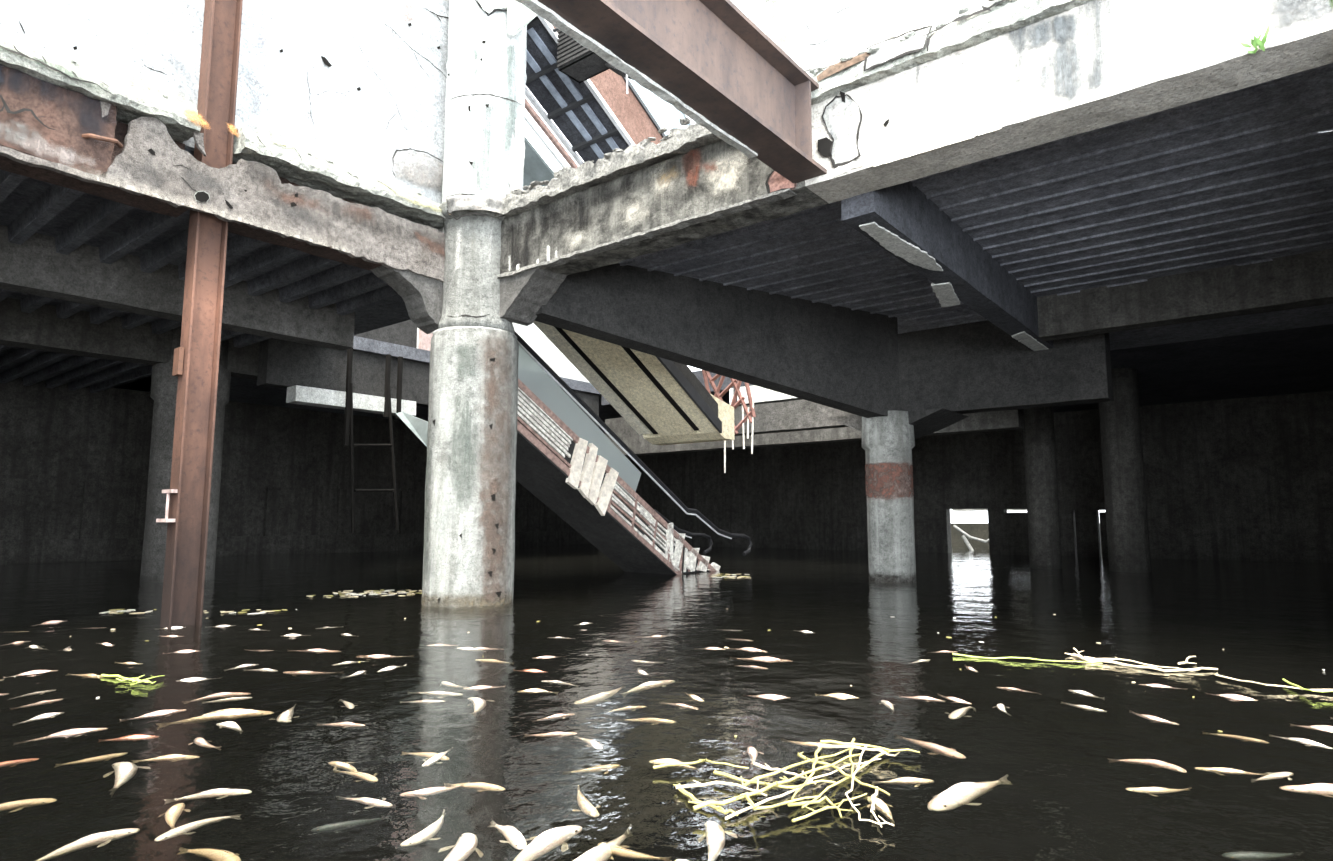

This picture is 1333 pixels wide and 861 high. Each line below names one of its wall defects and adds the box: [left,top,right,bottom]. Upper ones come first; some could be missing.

spalling [0,66,123,176]
corrosion [186,111,208,127]
peeling [792,49,871,81]
crack [821,0,1005,167]
water stain [1010,0,1104,100]